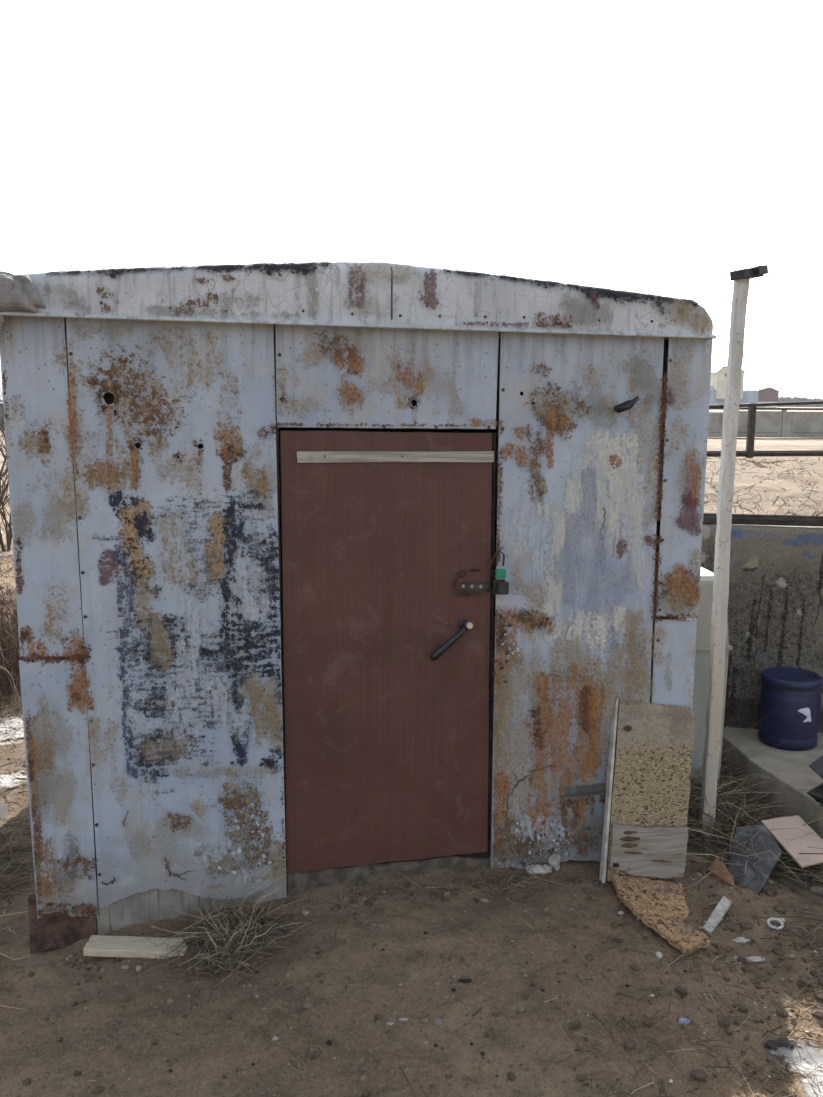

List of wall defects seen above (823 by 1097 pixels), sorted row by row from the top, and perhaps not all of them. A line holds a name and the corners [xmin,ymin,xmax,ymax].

rust [96,287,113,313]
rust [174,273,260,316]
rust [463,321,573,329]
rust [10,420,53,464]
rust [57,329,242,517]
rust [15,537,25,595]
peeling [118,499,229,588]
rust [258,330,704,870]
leakage [724,581,806,729]
rust [243,676,282,749]
rust [20,587,118,922]
rust [164,800,205,833]